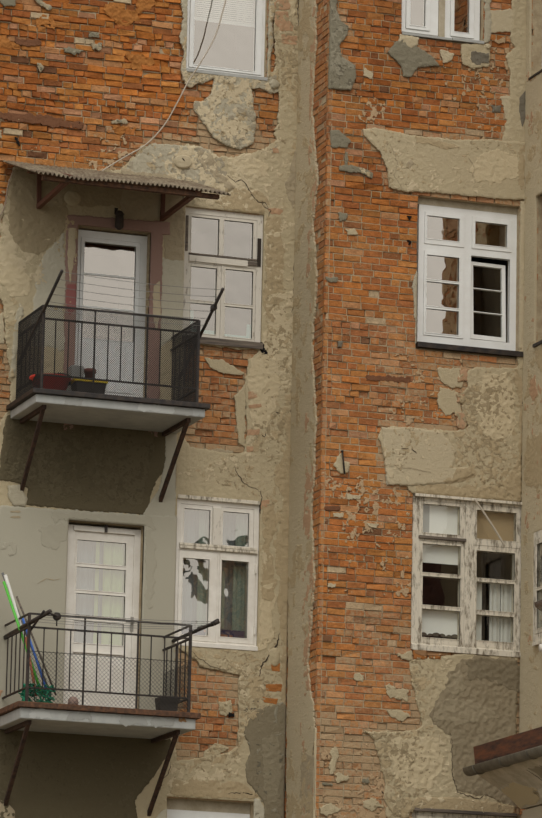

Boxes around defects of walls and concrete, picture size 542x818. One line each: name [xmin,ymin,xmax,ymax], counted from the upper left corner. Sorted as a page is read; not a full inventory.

crack [228,176,271,213]